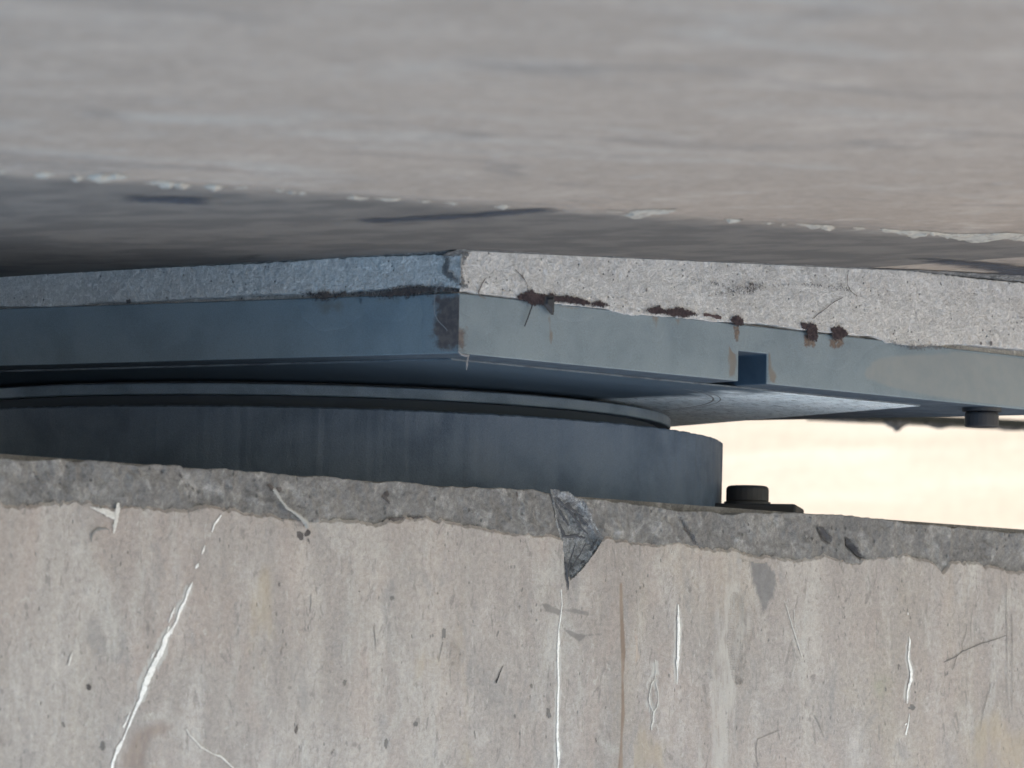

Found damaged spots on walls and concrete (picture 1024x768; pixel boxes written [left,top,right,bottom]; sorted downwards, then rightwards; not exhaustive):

corrosion [296,285,477,353]
corrosion [517,290,609,358]
corrosion [642,306,748,379]
corrosion [795,322,853,371]
spalling [550,489,603,590]
crack [98,515,222,768]
crack [546,575,570,768]
crack [899,614,920,735]